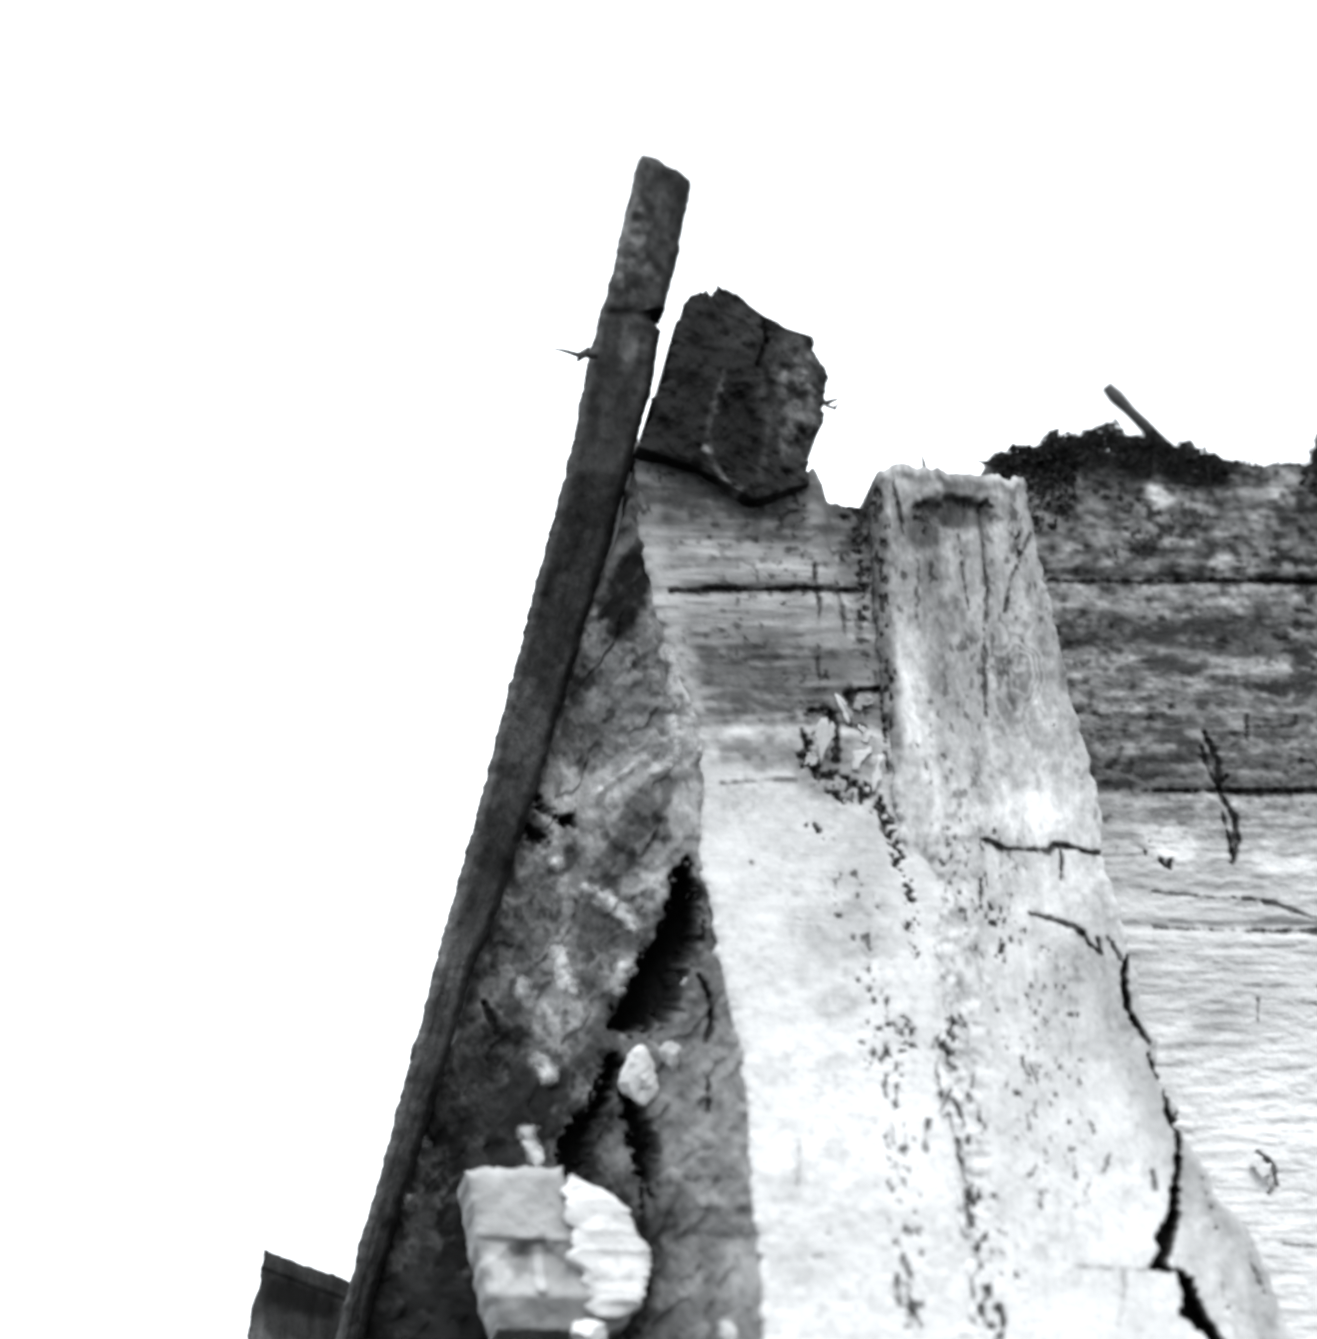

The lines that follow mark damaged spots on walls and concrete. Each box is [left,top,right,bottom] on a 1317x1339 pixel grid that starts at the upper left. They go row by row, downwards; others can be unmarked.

crack [669,565,848,625]
crack [1245,715,1296,729]
spalling [797,660,915,903]
crack [1153,731,1317,864]
crack [983,839,1100,869]
crack [697,974,713,1016]
crack [1029,912,1140,1032]
spalling [857,968,916,1109]
crack [1080,1063,1220,1339]
crack [1263,1156,1278,1194]
spalling [904,1284,924,1329]